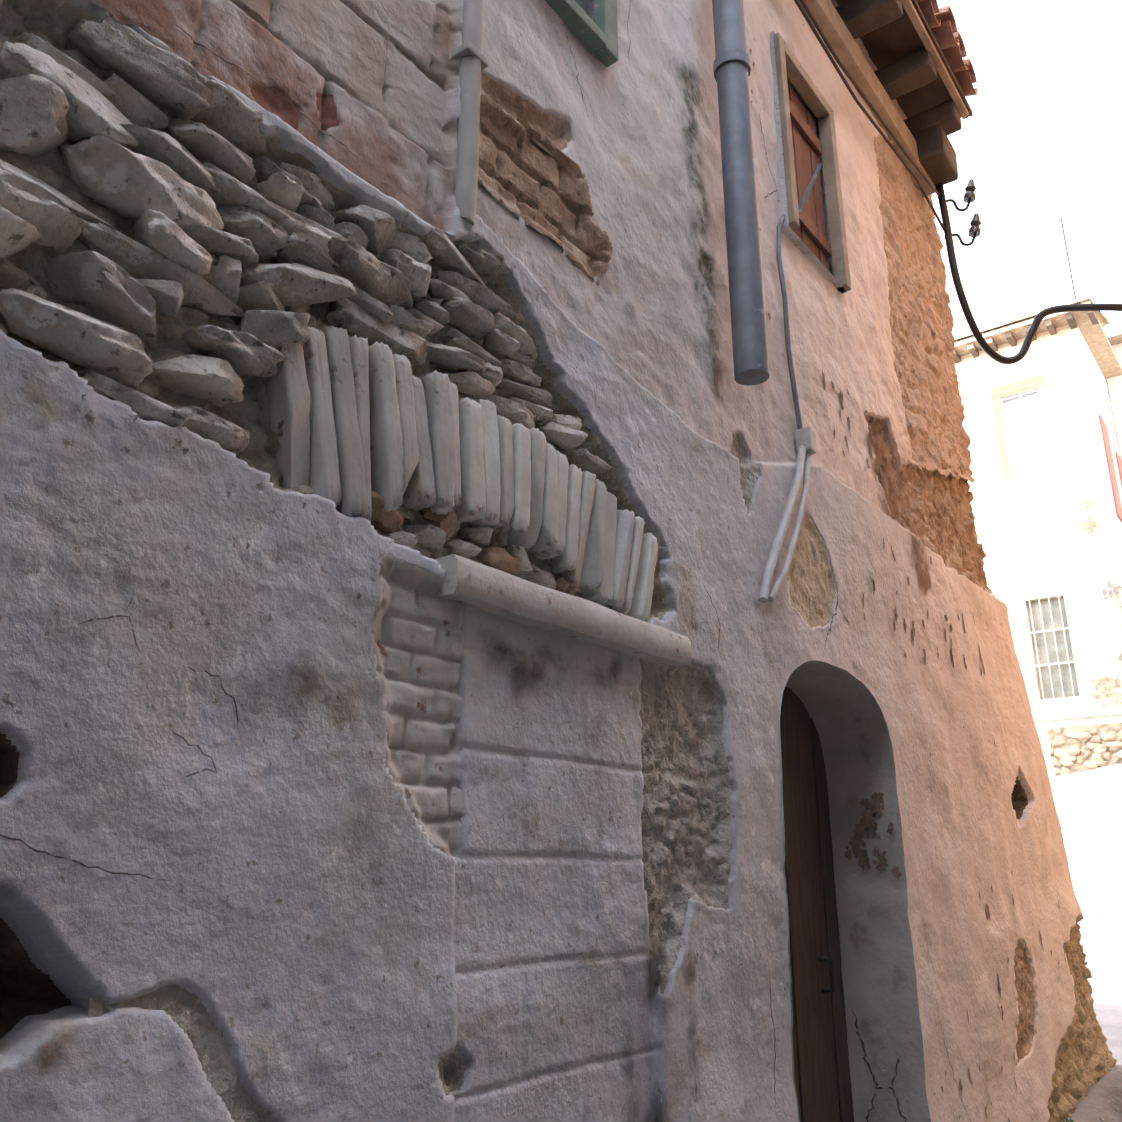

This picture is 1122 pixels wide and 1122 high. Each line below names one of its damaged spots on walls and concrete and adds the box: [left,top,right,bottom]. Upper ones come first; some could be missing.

spalling [0,0,650,534]
peeling [822,370,851,456]
spalling [864,135,993,594]
spalling [371,491,578,869]
spalling [649,552,668,620]
spalling [783,512,836,628]
peeling [893,575,989,676]
spalling [638,659,732,994]
peeling [88,984,272,1122]
spalling [438,1047,467,1096]
crack [851,1010,907,1122]
spalling [997,916,1117,1122]